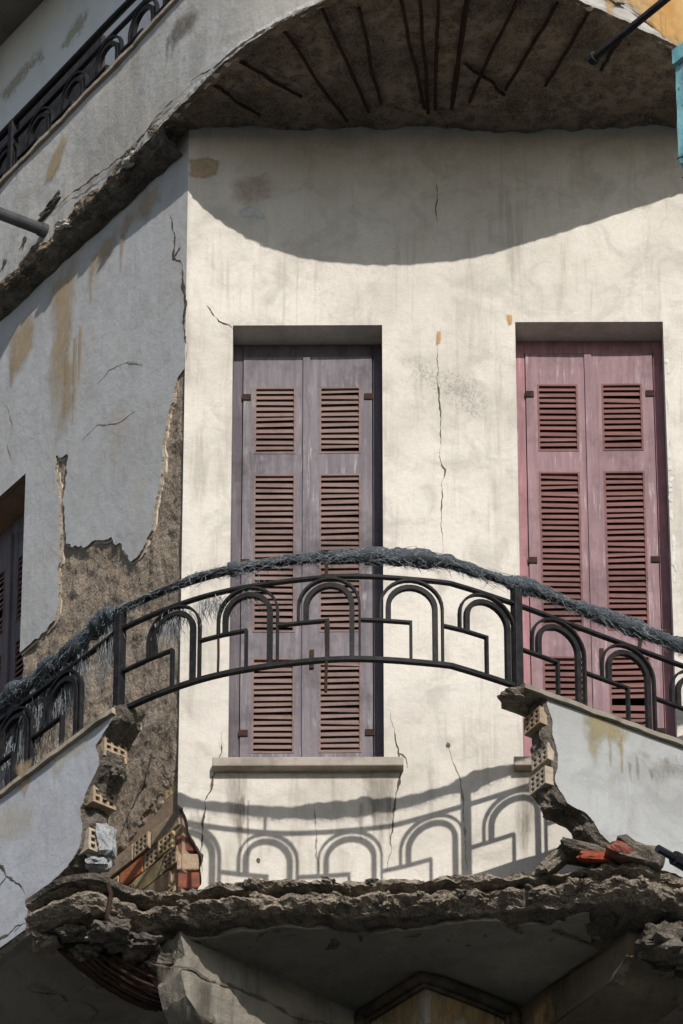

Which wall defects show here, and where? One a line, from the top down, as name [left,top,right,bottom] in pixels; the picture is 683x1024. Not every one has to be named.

spalling [0,0,681,321]
water stain [52,271,81,416]
crack [171,218,231,358]
crack [436,340,446,549]
spalling [0,374,683,1012]
crack [0,865,25,892]
crack [200,732,222,875]
crack [387,713,408,864]
crack [449,750,468,869]